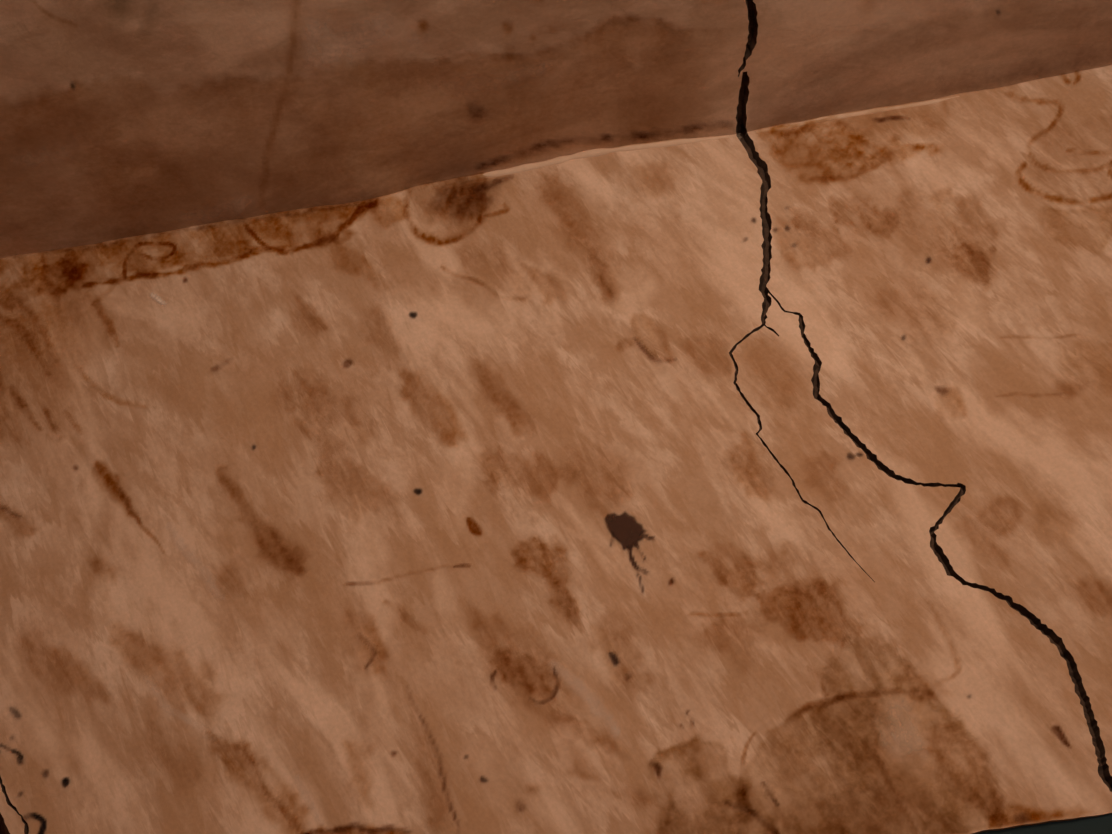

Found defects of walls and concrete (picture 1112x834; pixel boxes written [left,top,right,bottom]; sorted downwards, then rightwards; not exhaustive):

leakage [605,512,654,590]
crack [729,0,1112,792]